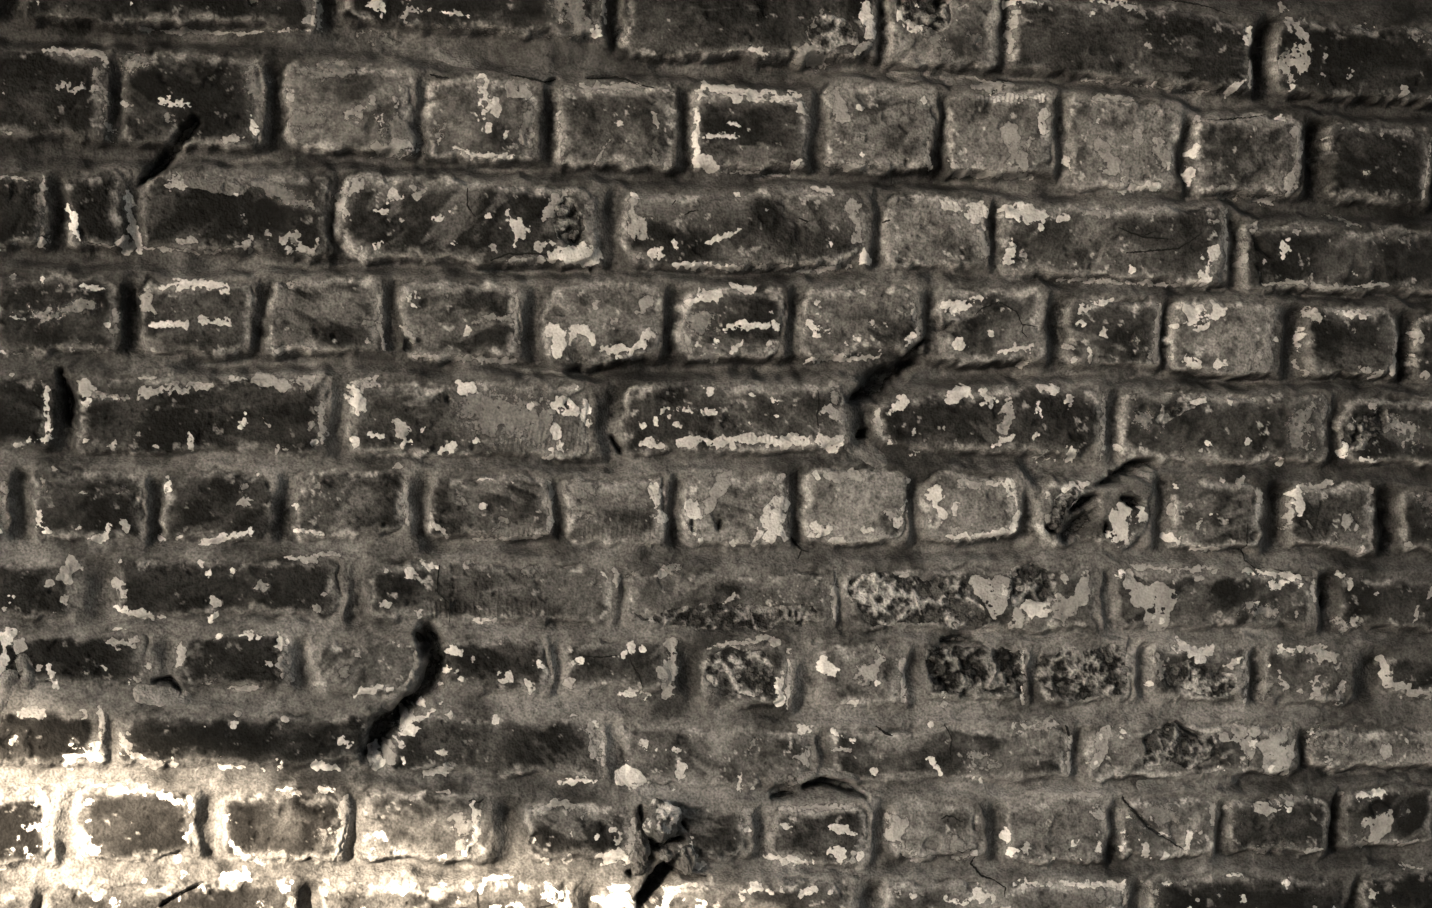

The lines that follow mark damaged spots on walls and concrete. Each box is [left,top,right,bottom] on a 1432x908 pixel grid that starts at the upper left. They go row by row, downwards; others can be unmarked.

peeling [940,294,987,316]
peeling [951,337,966,351]
peeling [987,330,1035,369]
peeling [639,298,921,485]
peeling [944,383,1015,448]
peeling [1032,383,1077,463]
peeling [1242,567,1317,605]
spalling [617,469,1250,908]
spalling [1143,722,1317,776]
peeling [465,713,652,908]
crack [1122,795,1184,850]
peeling [1251,794,1318,817]